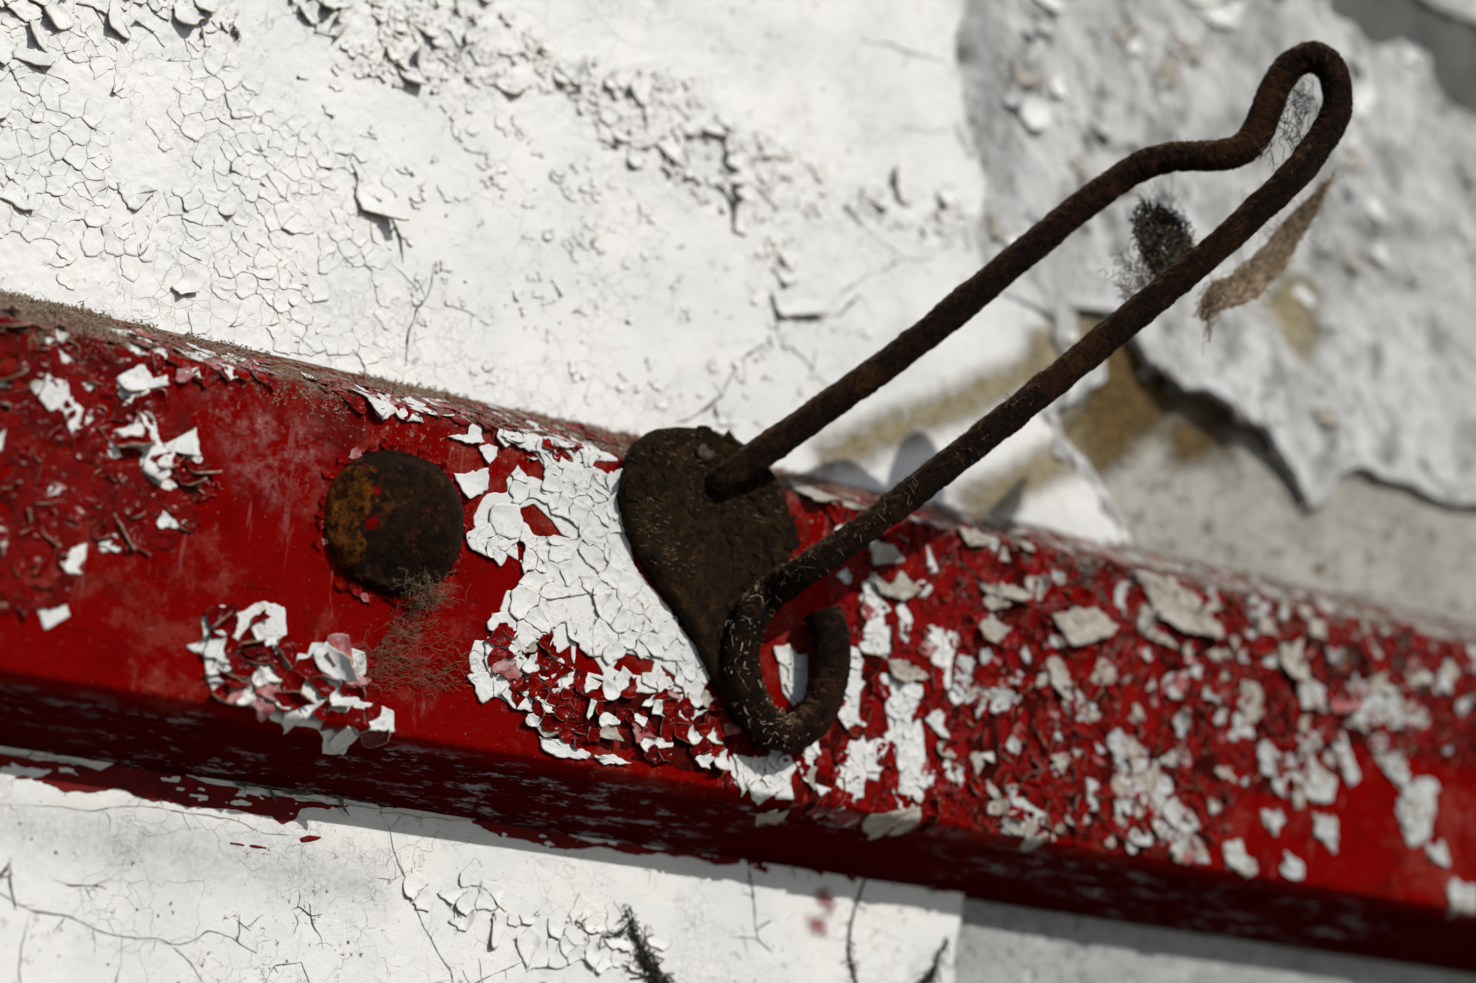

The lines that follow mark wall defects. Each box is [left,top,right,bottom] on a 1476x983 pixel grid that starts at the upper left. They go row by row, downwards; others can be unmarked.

peeling [0,0,418,380]
peeling [292,0,830,320]
peeling [1002,61,1067,131]
peeling [1298,0,1476,283]
peeling [0,303,278,629]
rust [816,313,1092,474]
rust [957,342,1229,517]
rust [1250,274,1323,368]
peeling [187,332,1476,880]
crack [0,764,532,983]
crack [731,860,773,953]
peeling [1445,878,1476,918]